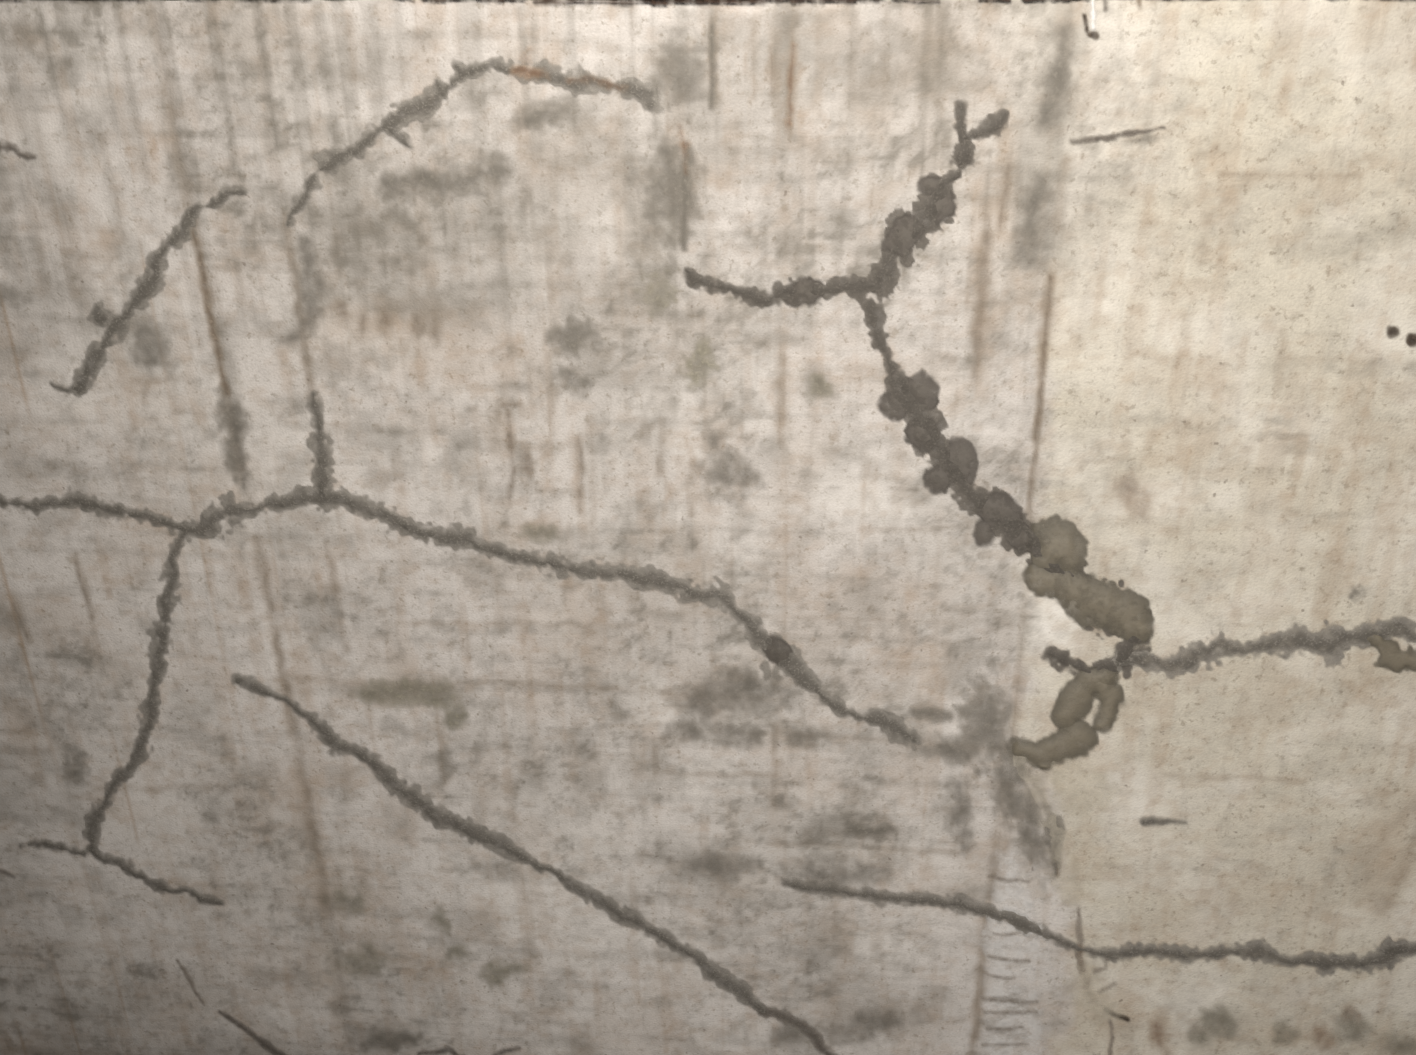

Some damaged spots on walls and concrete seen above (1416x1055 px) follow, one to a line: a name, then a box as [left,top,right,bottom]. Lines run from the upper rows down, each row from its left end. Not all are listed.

crack [0,143,36,159]
crack [287,56,659,226]
crack [50,186,247,396]
crack [685,101,1416,770]
crack [0,391,920,905]
crack [177,961,286,1055]
crack [232,674,835,1055]
crack [782,879,1416,1055]